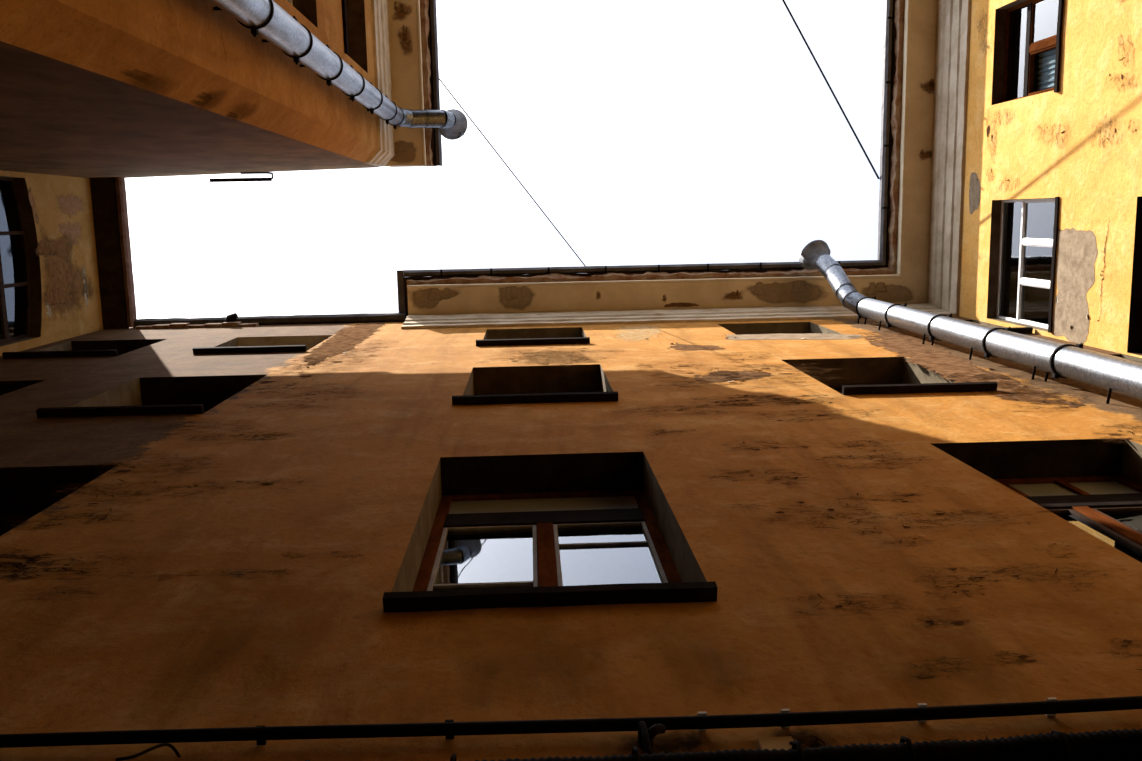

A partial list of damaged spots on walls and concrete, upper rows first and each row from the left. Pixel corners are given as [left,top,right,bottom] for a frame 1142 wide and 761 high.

flaking render [969,112,1018,214]
flaking render [1052,228,1097,344]